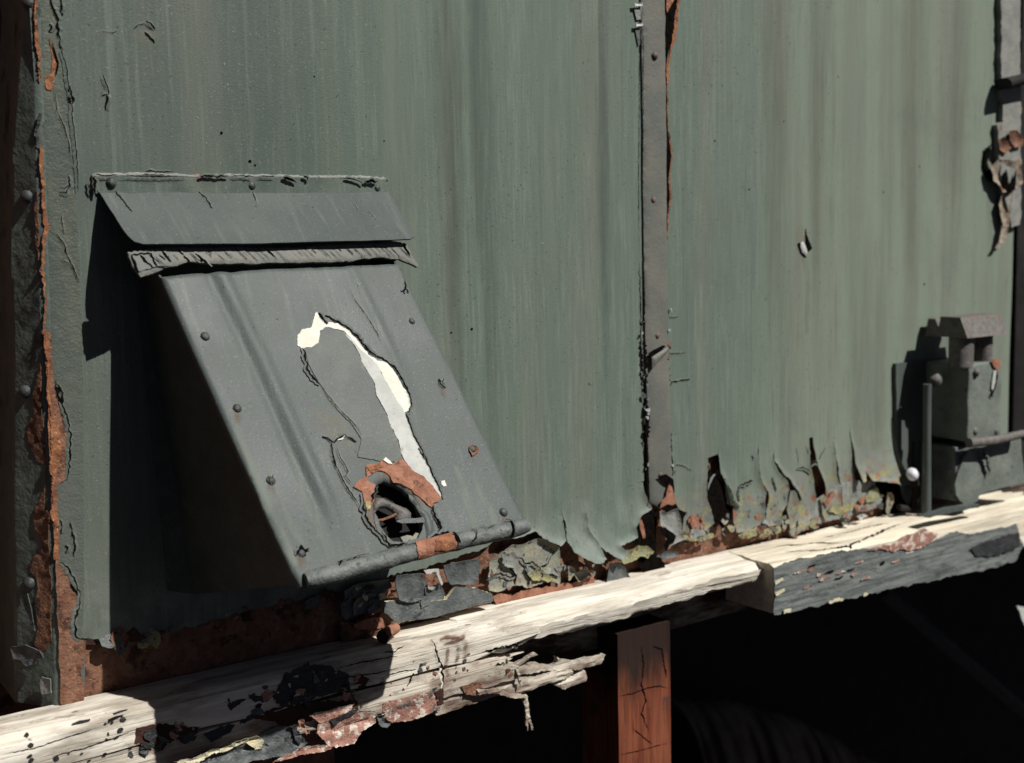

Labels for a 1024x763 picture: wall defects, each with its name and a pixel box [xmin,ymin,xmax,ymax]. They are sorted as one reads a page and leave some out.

corrosion [665,0,680,239]
peeling [983,130,1024,249]
corrosion [27,141,87,705]
peeling [297,312,447,511]
corrosion [415,532,457,560]
peeling [285,419,938,624]
peeling [970,533,1021,557]
peeling [86,626,175,656]
corrosion [339,612,386,642]
crack [620,646,667,754]